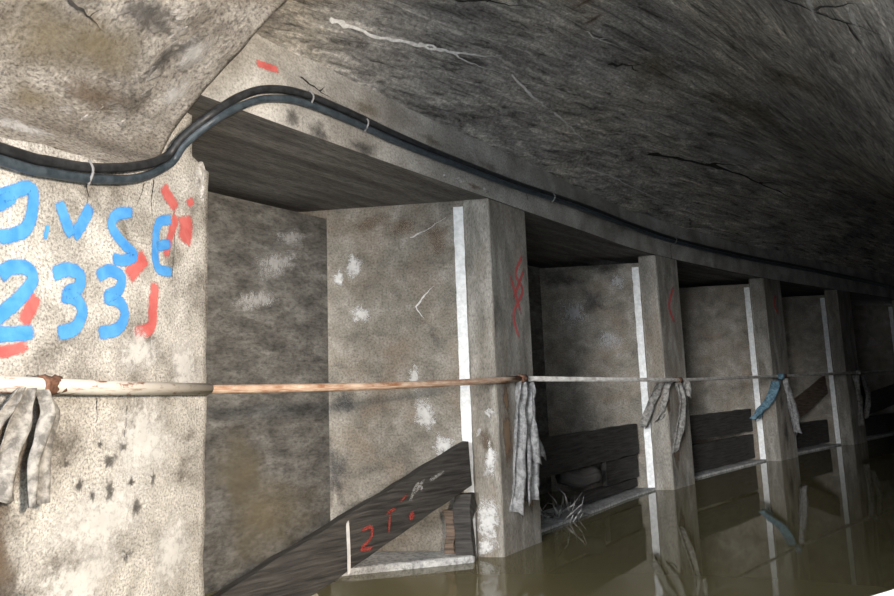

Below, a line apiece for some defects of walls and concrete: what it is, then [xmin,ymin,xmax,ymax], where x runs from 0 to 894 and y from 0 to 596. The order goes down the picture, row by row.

crack [785,0,886,57]